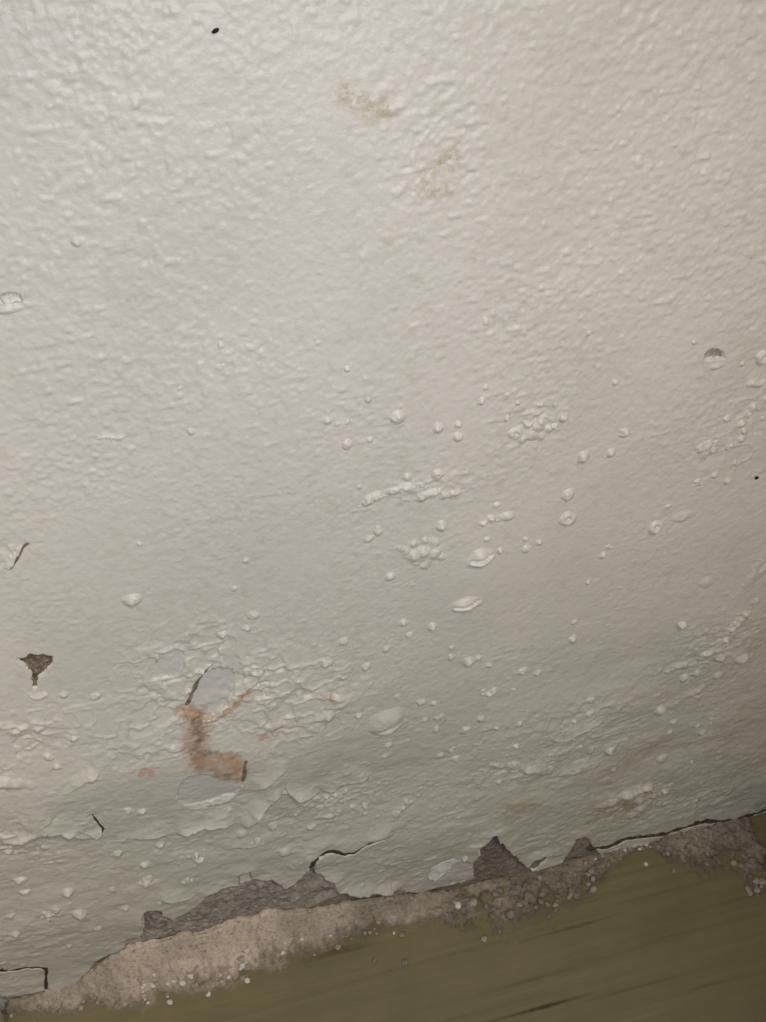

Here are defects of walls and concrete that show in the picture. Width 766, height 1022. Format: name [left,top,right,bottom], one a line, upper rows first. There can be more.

peeling [705,349,724,370]
crack [2,543,29,570]
peeling [20,653,53,700]
crack [185,668,209,706]
peeling [179,664,263,727]
peeling [0,754,373,846]
crack [588,809,766,851]
crack [308,841,378,868]
peeling [394,836,645,894]
peeling [125,868,382,947]